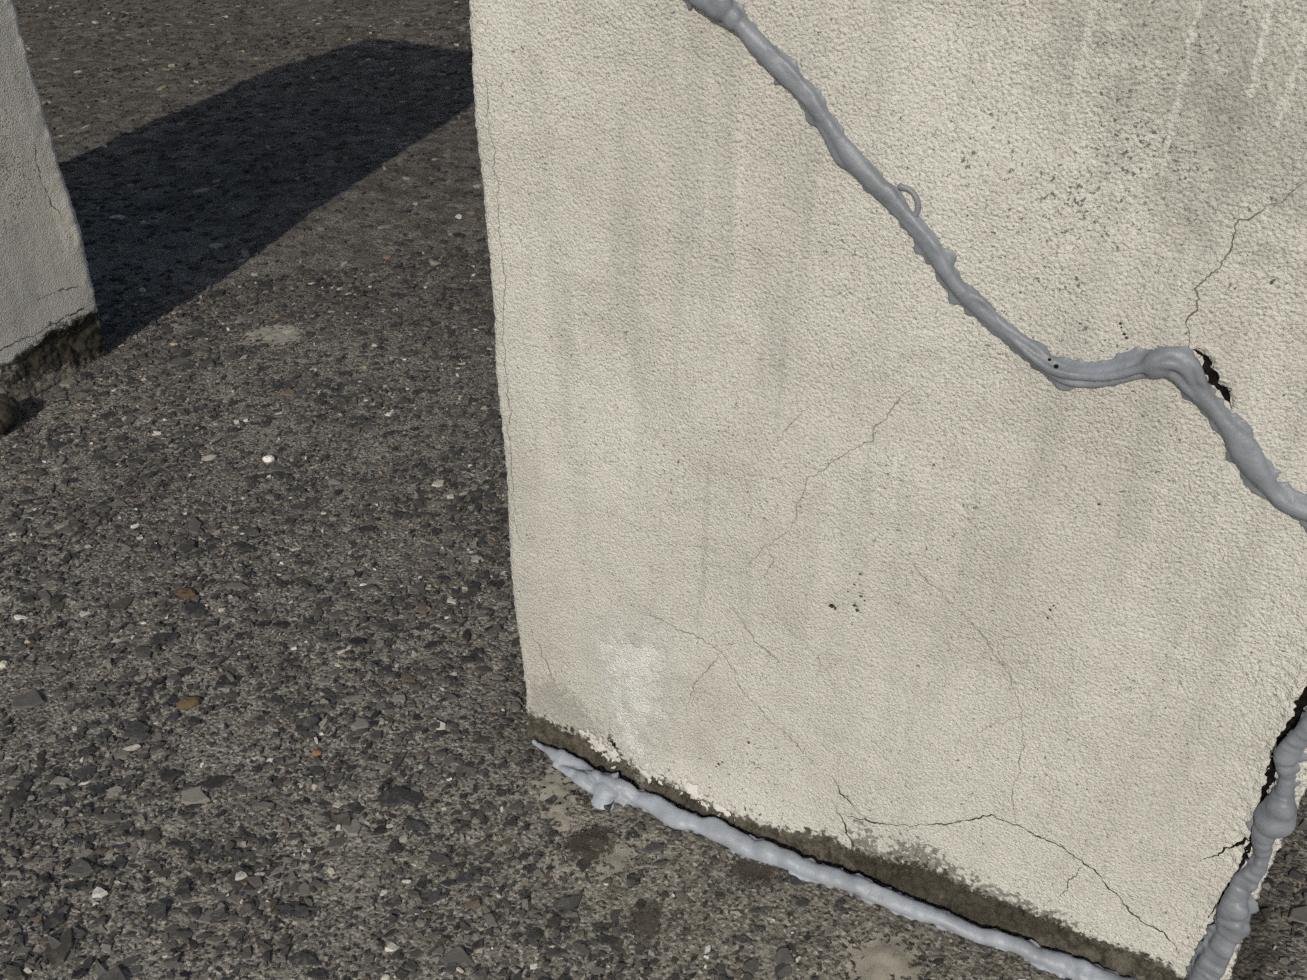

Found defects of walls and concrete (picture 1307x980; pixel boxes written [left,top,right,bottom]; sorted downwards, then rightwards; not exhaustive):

crack [0,286,90,351]
crack [1185,182,1305,409]
crack [710,388,913,579]
leakage [564,822,621,865]
crack [639,609,810,759]
leakage [721,856,779,892]
crack [832,561,1181,957]
crack [1205,687,1307,924]